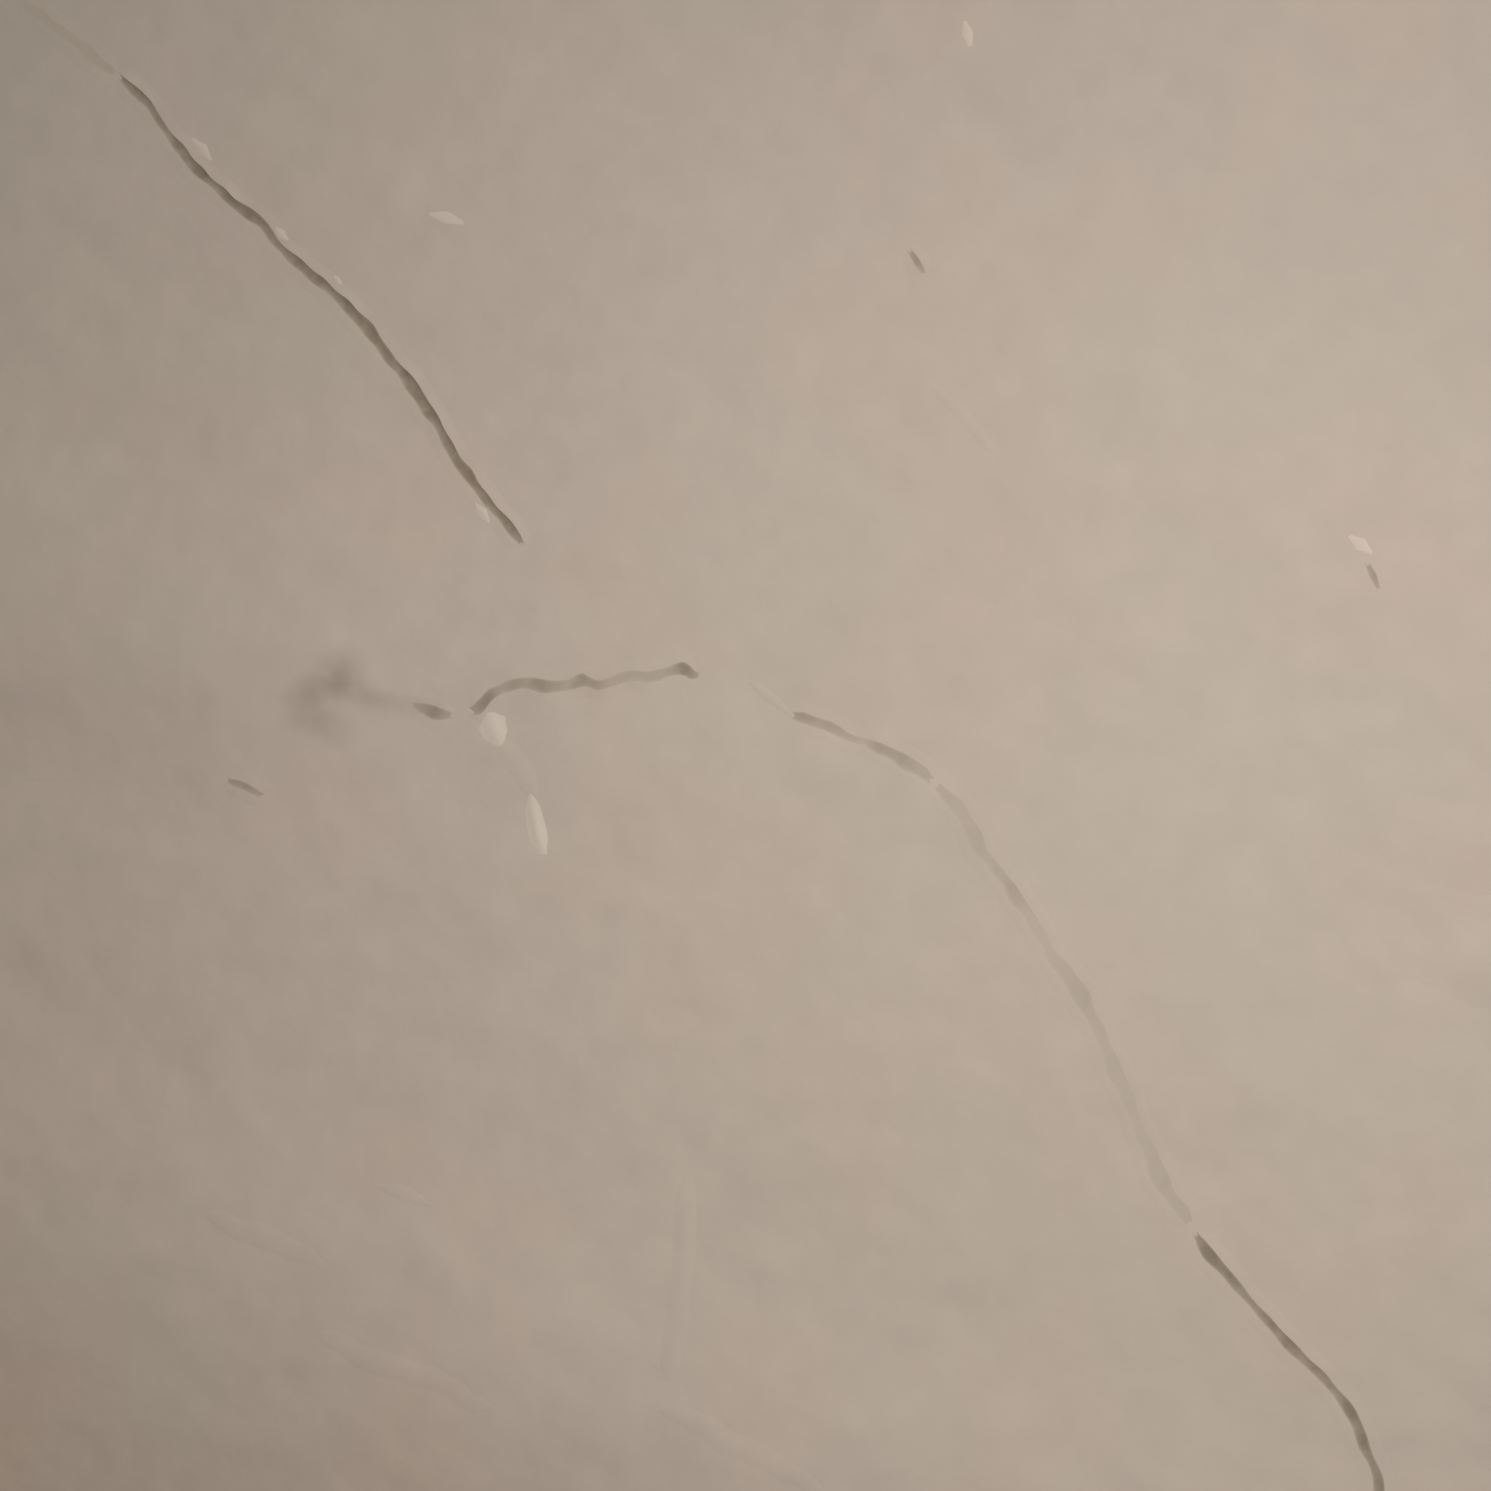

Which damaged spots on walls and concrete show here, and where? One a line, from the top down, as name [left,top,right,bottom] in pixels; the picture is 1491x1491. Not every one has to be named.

crack [18,0,530,548]
crack [409,651,699,855]
crack [749,680,1396,1491]